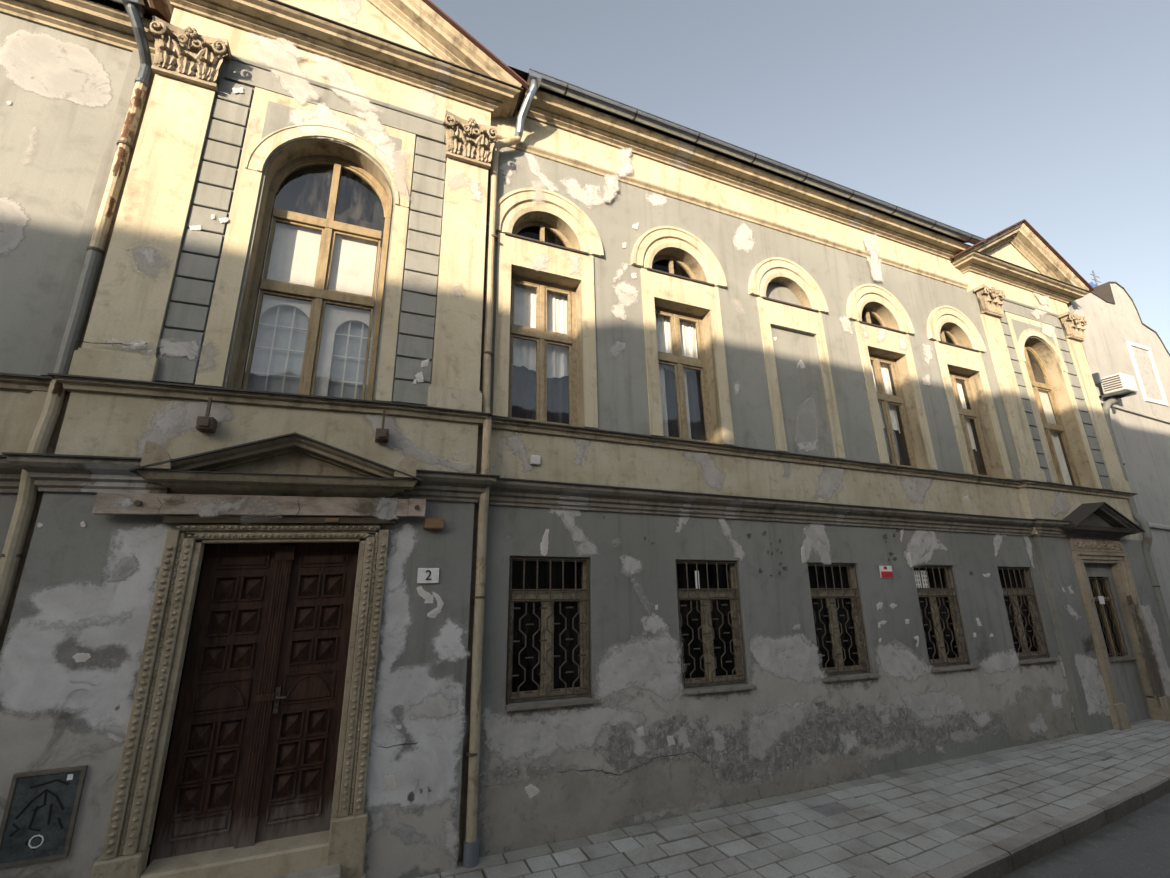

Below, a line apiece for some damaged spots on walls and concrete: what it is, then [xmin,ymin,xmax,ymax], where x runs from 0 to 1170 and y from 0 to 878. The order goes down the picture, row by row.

corrosion [112,88,142,178]
peeling [357,121,396,175]
corrosion [105,196,116,218]
peeling [540,529,549,556]
peeling [548,508,597,556]
peeling [416,585,444,618]
flaking render [477,602,1079,856]
flaking render [363,798,458,878]